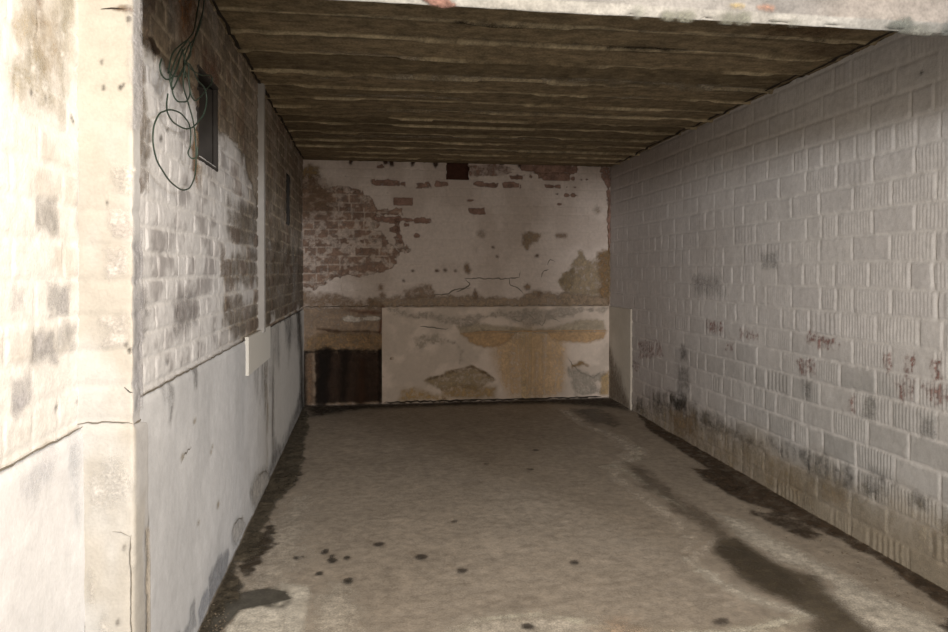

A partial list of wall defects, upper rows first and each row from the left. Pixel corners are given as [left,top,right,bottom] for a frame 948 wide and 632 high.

peeling [662,11,695,23]
peeling [721,11,751,25]
peeling [127,0,588,406]
peeling [558,166,611,306]
damp [268,291,870,526]
crack [120,528,149,632]
damp [207,495,366,632]
damp [446,614,674,632]
damp [566,409,947,632]